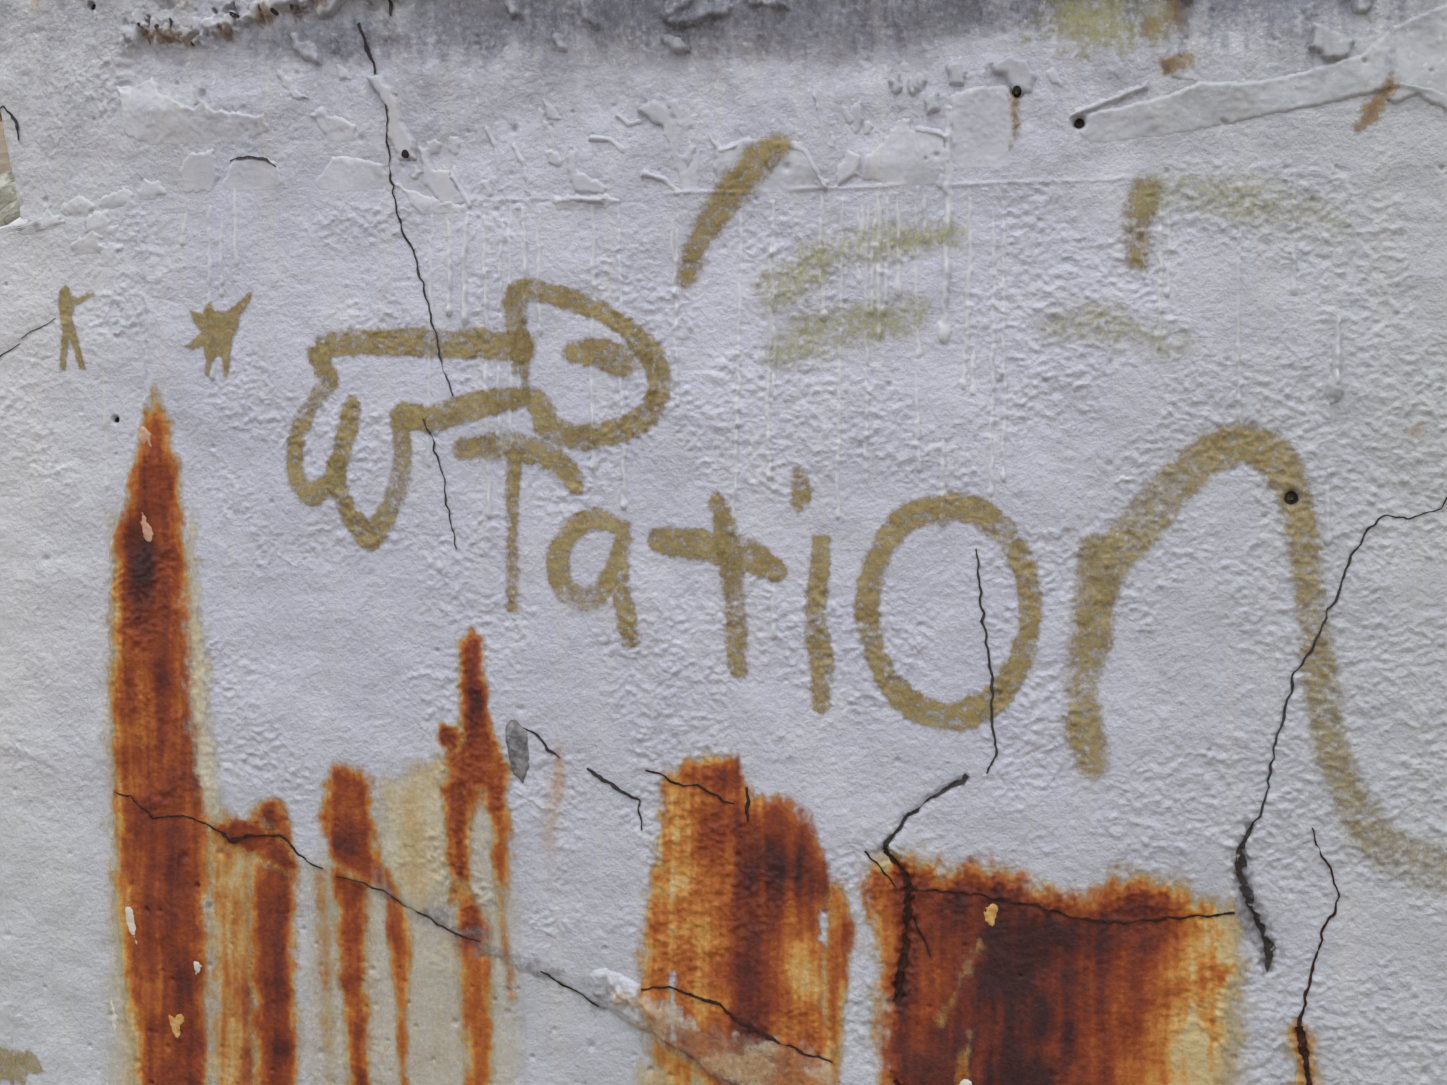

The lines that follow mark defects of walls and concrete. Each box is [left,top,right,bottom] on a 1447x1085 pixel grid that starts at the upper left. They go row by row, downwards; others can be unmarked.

peeling [15,77,283,267]
peeling [276,0,528,215]
peeling [615,56,1062,197]
peeling [1068,0,1447,143]
corrosion [107,388,413,1085]
corrosion [438,627,516,1085]
crack [523,727,751,831]
crack [641,986,833,1063]
corrosion [636,754,1247,1085]
crack [864,497,1447,1004]
corrosion [1286,1022,1320,1085]
crack [1295,827,1340,1085]